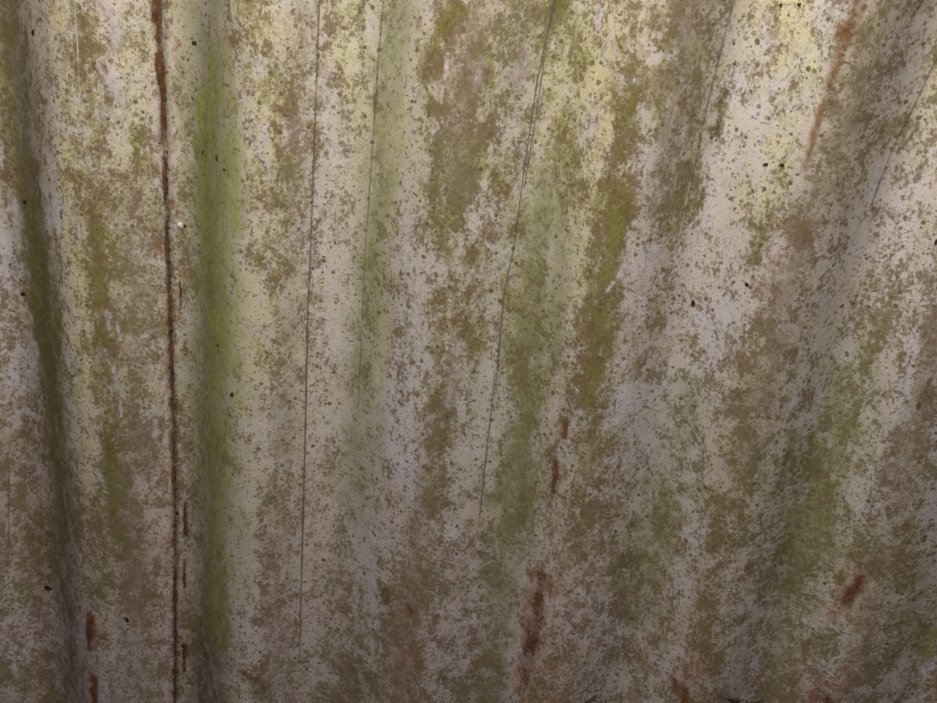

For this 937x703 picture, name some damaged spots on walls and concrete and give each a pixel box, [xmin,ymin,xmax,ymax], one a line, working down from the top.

corrosion [832,0,858,76]
corrosion [806,90,828,160]
corrosion [151,0,188,703]
corrosion [522,571,547,683]
corrosion [89,674,98,703]